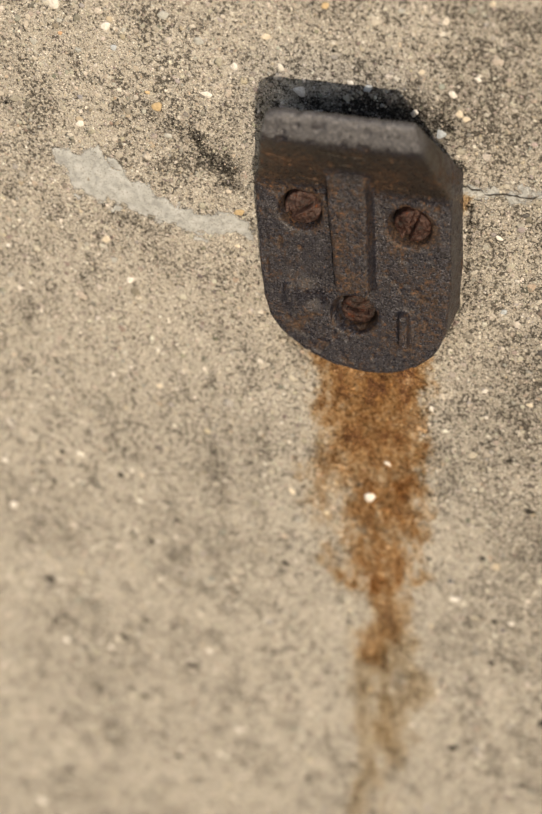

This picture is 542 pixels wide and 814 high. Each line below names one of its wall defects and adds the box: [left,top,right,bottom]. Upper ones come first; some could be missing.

crack [463,186,539,200]
rust [345,369,427,513]